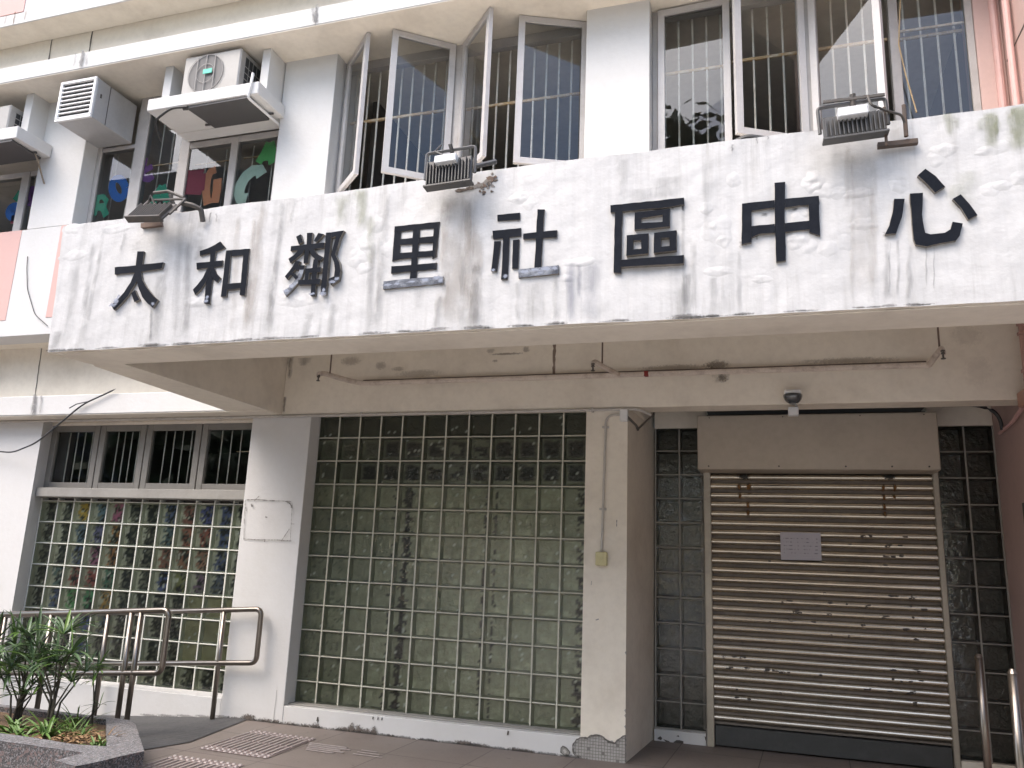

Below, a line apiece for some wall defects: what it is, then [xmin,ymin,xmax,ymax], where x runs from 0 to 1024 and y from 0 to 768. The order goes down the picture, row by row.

peeling [560,709,626,763]